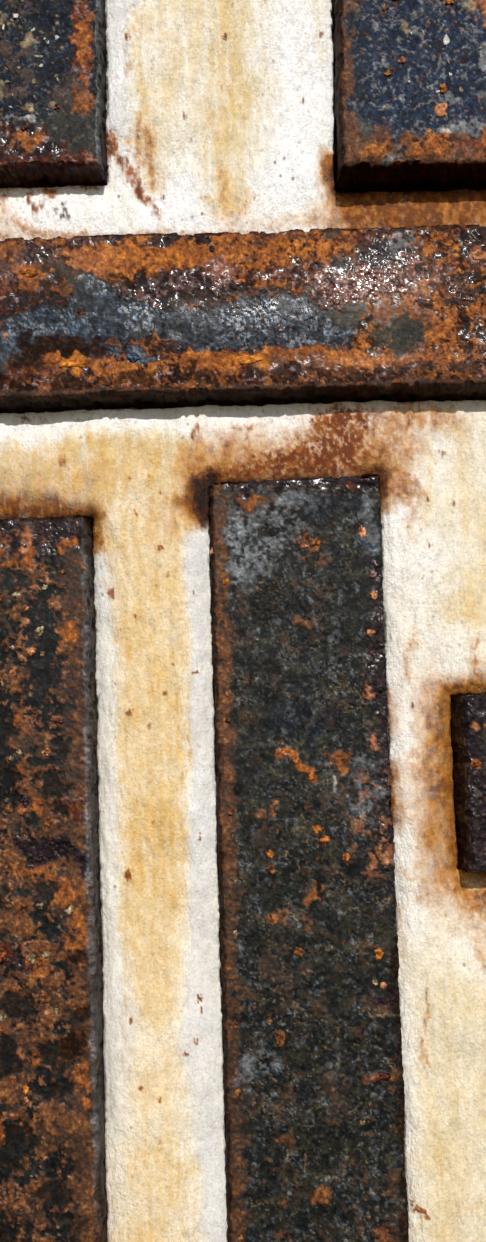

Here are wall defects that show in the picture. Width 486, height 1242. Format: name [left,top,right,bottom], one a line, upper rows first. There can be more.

rust [0,0,486,431]
rust [0,431,162,1242]
rust [172,404,419,1242]
rust [412,641,486,919]